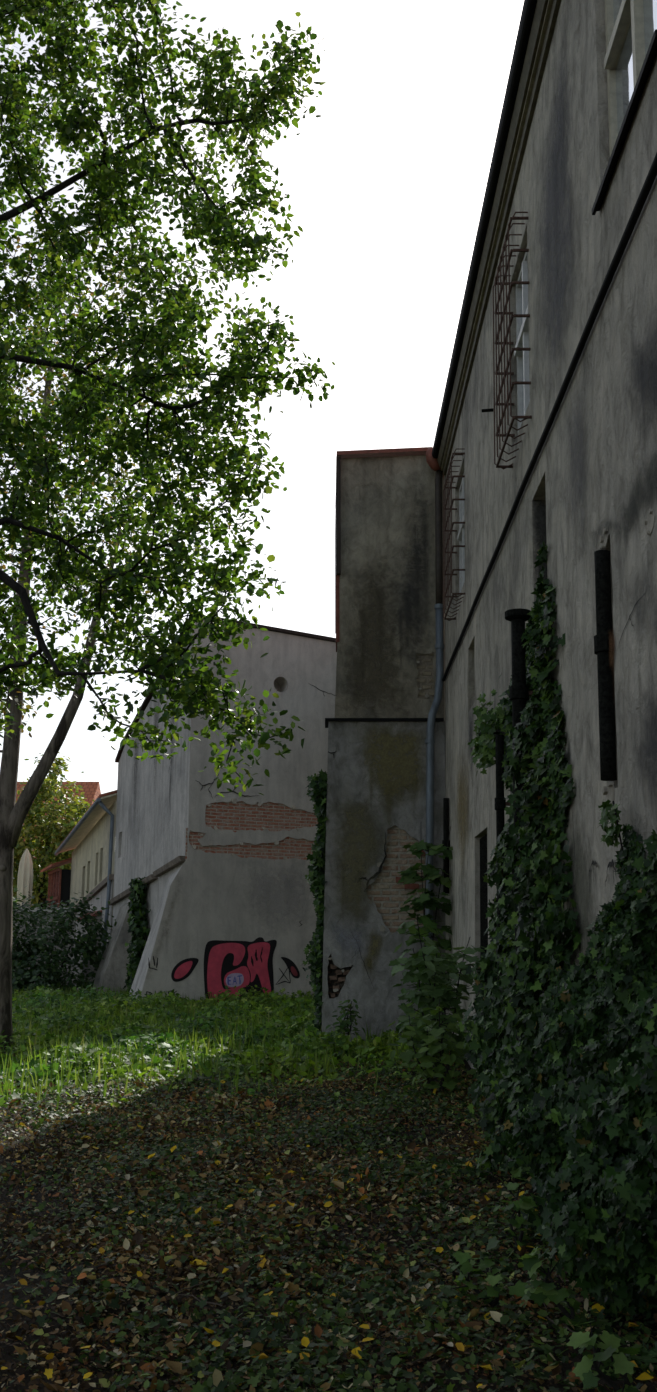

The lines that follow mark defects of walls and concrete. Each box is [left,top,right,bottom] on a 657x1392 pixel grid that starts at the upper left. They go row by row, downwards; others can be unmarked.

flaking render [185,798,318,860]
flaking render [363,826,426,935]